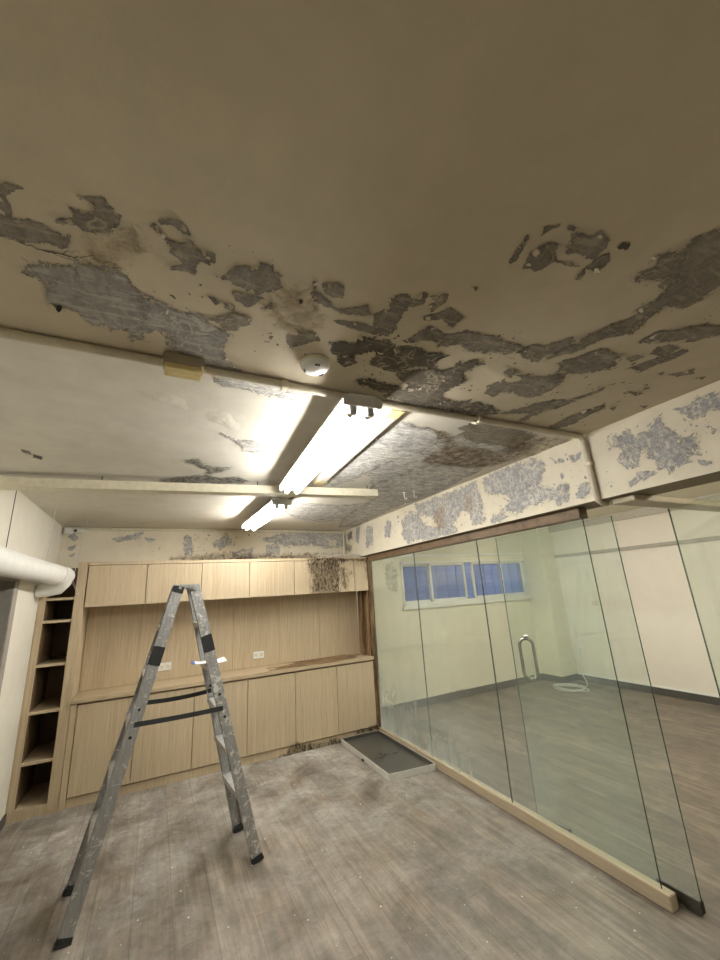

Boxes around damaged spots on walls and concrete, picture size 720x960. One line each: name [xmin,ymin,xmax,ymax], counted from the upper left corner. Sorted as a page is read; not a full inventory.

peeling [0,182,123,250]
peeling [18,218,308,402]
peeling [183,224,720,559]
damp [171,531,371,593]